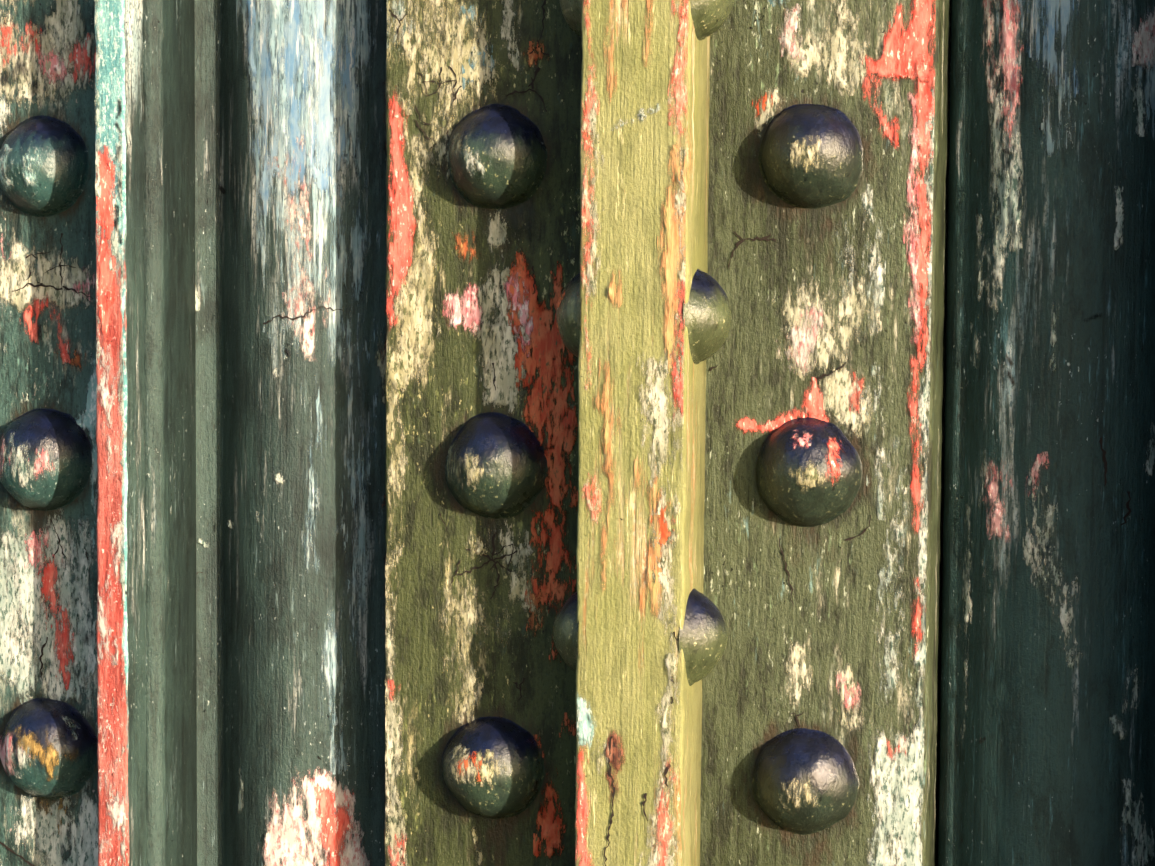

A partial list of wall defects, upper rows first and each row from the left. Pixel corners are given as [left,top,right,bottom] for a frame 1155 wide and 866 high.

crack [12,233,93,299]
peeling [0,0,124,490]
crack [263,306,344,324]
peeling [250,0,578,866]
peeling [752,89,781,136]
peeling [736,184,886,487]
peeling [779,0,936,866]
peeling [982,0,1023,312]
peeling [0,500,125,708]
crack [448,528,520,599]
peeling [0,716,78,782]
peeling [10,772,126,866]